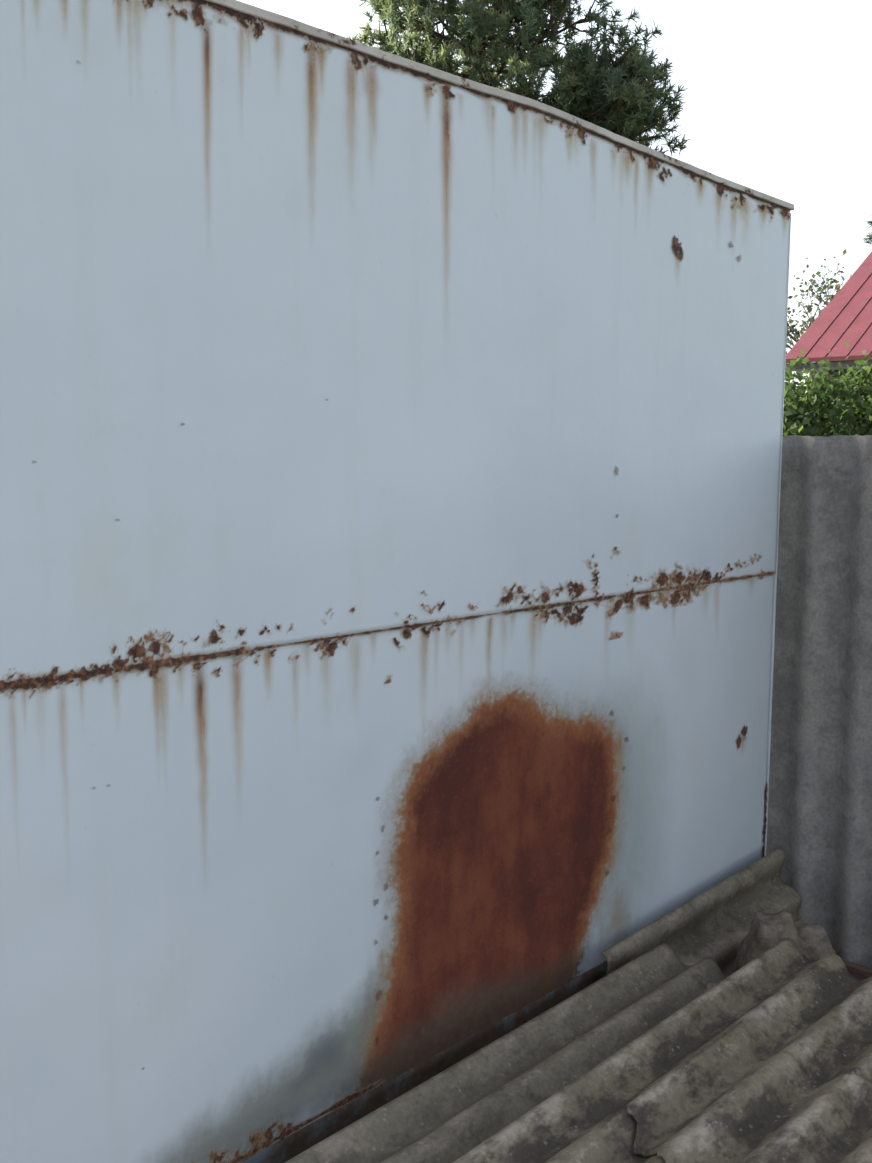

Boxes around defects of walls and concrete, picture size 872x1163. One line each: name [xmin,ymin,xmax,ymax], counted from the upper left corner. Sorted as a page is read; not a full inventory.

rust [142,0,790,219]
rust [671,235,684,261]
rust [0,554,774,748]
rust [209,688,623,1163]